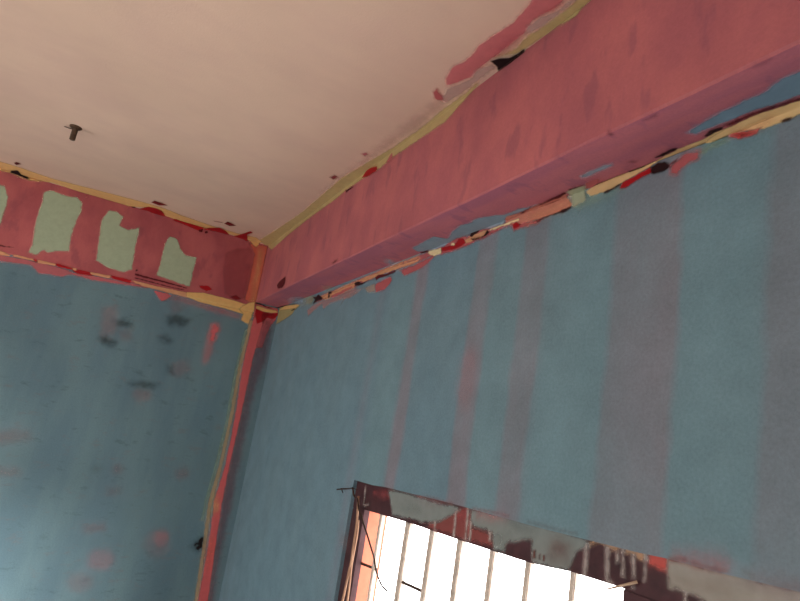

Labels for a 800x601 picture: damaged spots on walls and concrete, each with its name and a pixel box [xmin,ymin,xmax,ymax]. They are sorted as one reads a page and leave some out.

spalling [491,50,524,70]
peeling [313,101,800,303]
peeling [0,251,299,348]